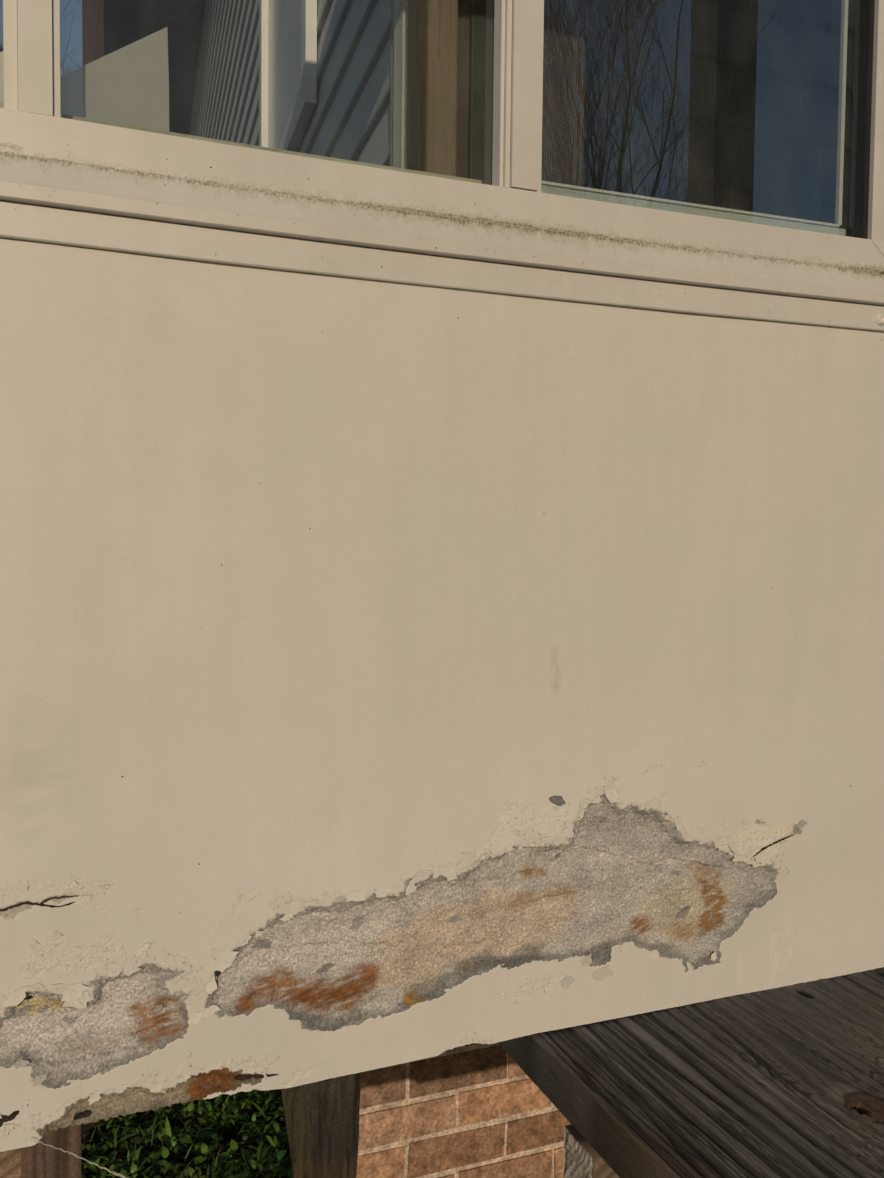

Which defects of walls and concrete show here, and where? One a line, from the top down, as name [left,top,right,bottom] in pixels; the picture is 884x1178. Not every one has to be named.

crack [0,873,126,922]
rust [700,881,726,931]
peeling [0,774,808,1139]
rust [242,965,377,1009]
rust [133,998,179,1041]
rust [190,1070,238,1098]